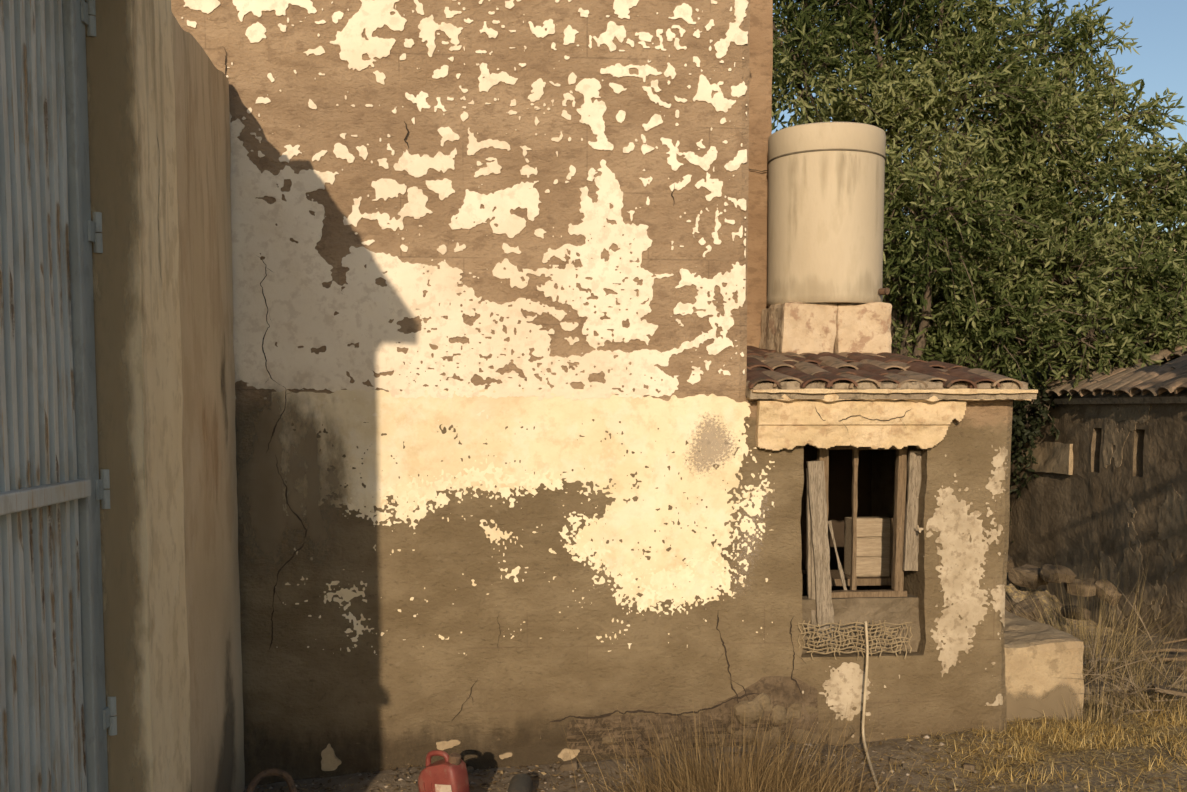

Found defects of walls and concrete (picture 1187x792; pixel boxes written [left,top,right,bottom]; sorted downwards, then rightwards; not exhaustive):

peeling [175,0,775,655]
crack [258,256,307,649]
leakage [235,392,774,615]
crack [550,615,759,726]
spalling [558,662,886,761]
crack [789,618,803,693]
peeling [917,445,1008,677]
peeling [985,694,1003,706]